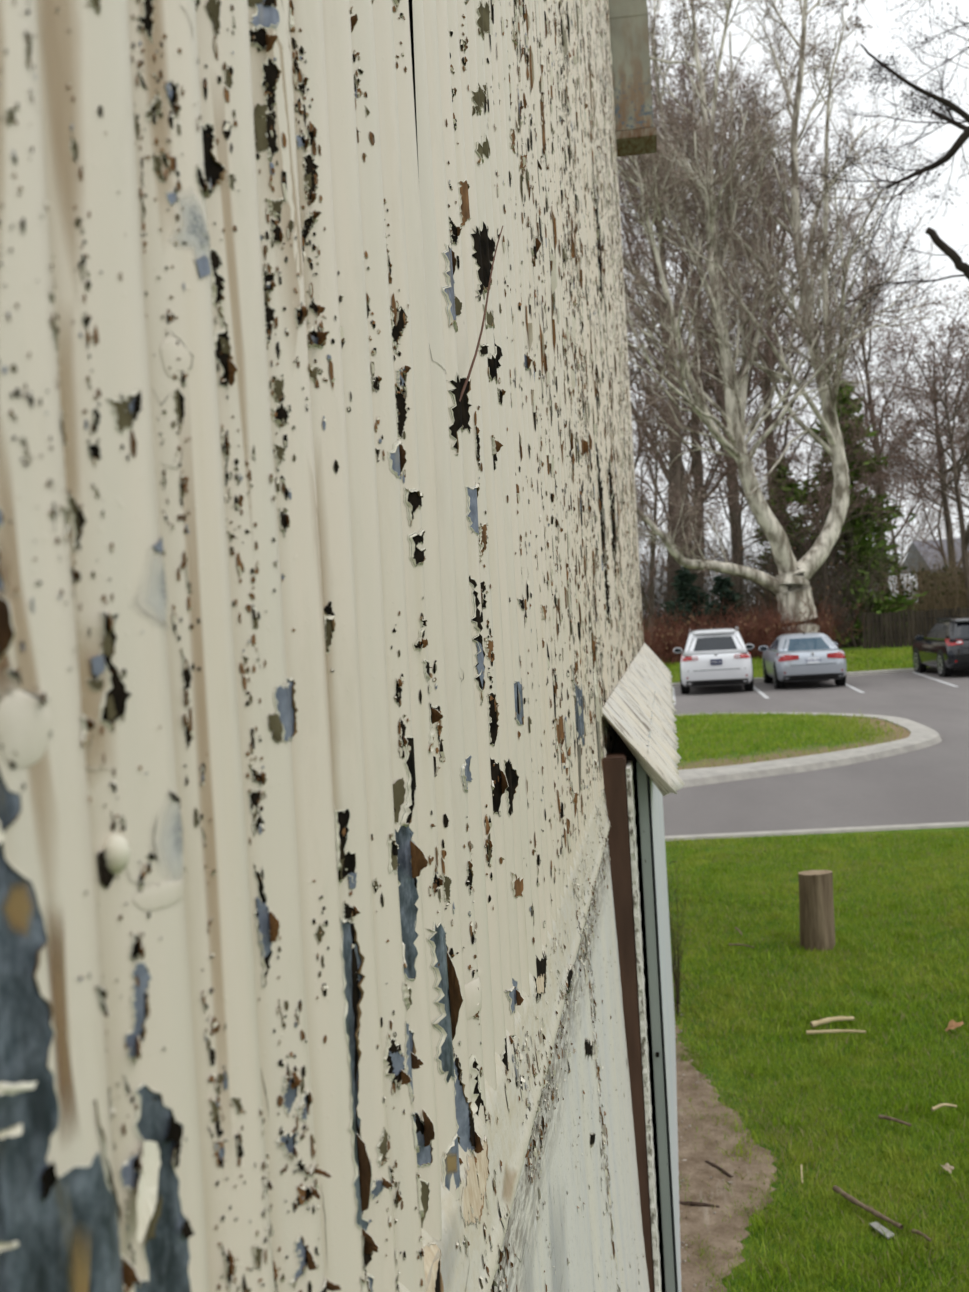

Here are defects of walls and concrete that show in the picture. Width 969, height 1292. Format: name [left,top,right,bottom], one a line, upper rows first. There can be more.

peeling [138,0,156,44]
peeling [195,0,310,163]
peeling [441,179,506,405]
peeling [62,492,87,584]
peeling [0,553,49,706]
peeling [80,611,133,746]
peeling [268,676,298,743]
peeling [0,769,196,1292]
peeling [314,923,325,944]
peeling [334,678,493,1292]